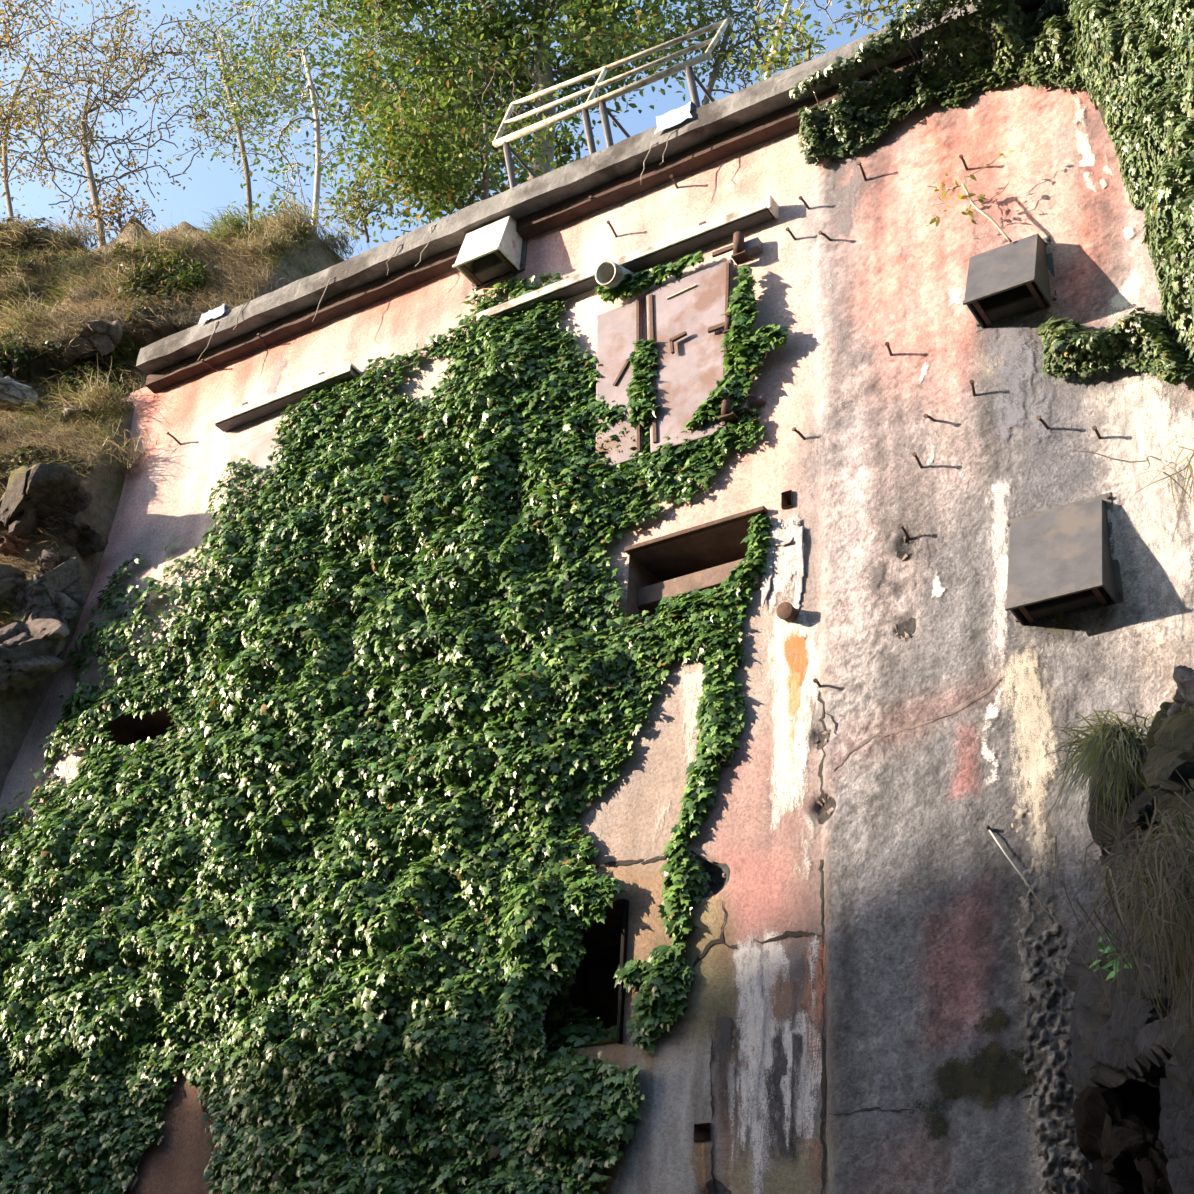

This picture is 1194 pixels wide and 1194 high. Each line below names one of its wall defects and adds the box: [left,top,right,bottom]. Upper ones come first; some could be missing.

peeling [760,519,805,611]
rust [784,632,808,746]
crack [817,691,837,821]
spalling [702,860,729,898]
leakage [710,930,822,1194]
rust [769,939,828,1078]
crack [692,859,914,1194]